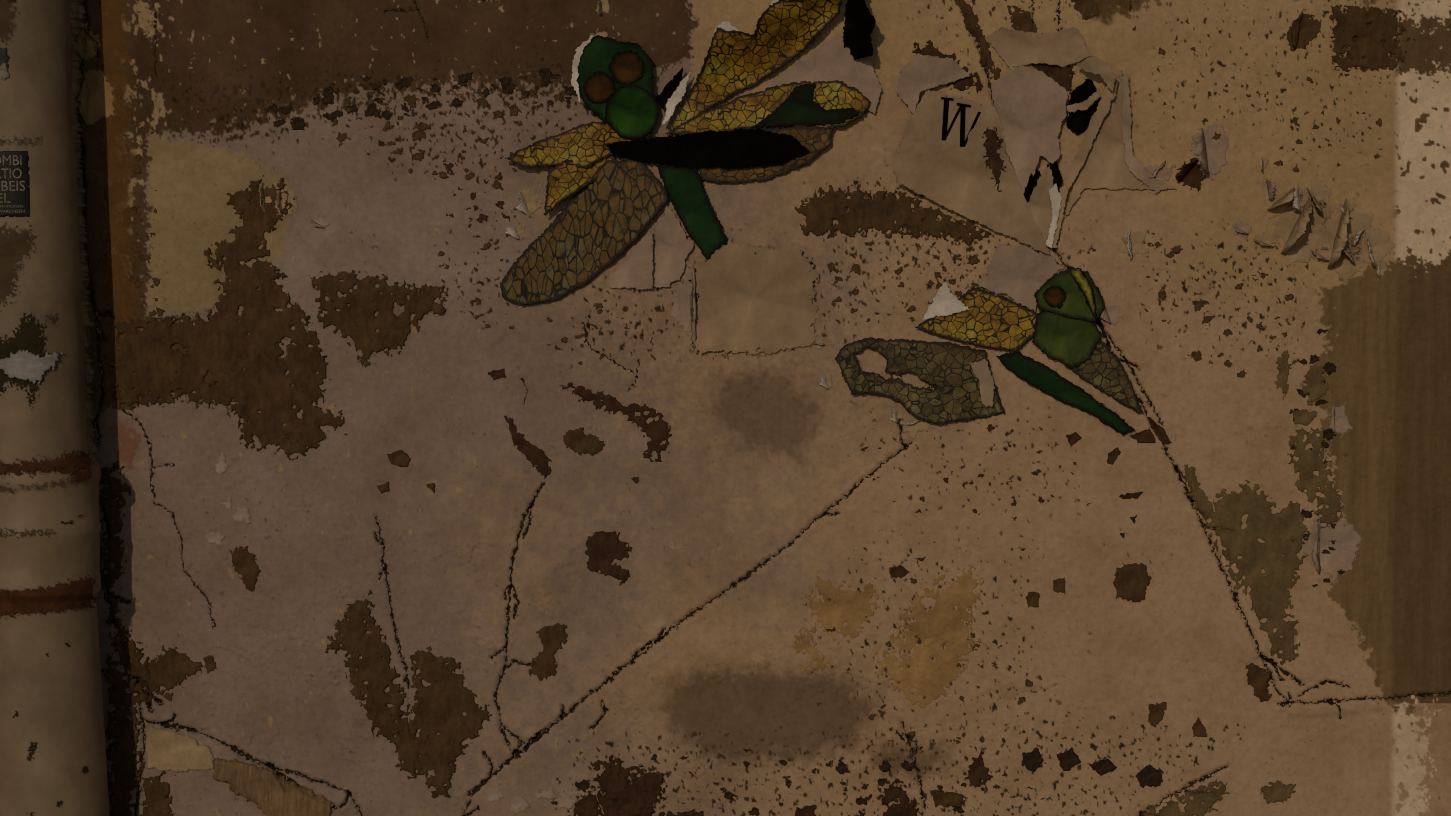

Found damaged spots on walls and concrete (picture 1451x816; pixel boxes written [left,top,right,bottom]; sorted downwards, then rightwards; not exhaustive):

peeling [264,65,578,261]
peeling [1233,5,1405,284]
spalling [110,175,478,460]
corrosion [0,515,83,539]
corrosion [0,450,94,494]
corrosion [0,571,97,619]
crack [100,572,362,816]
crack [374,516,410,689]
spalling [325,590,492,798]
crack [463,419,912,816]
spalling [1182,294,1361,702]
crack [1096,319,1451,720]